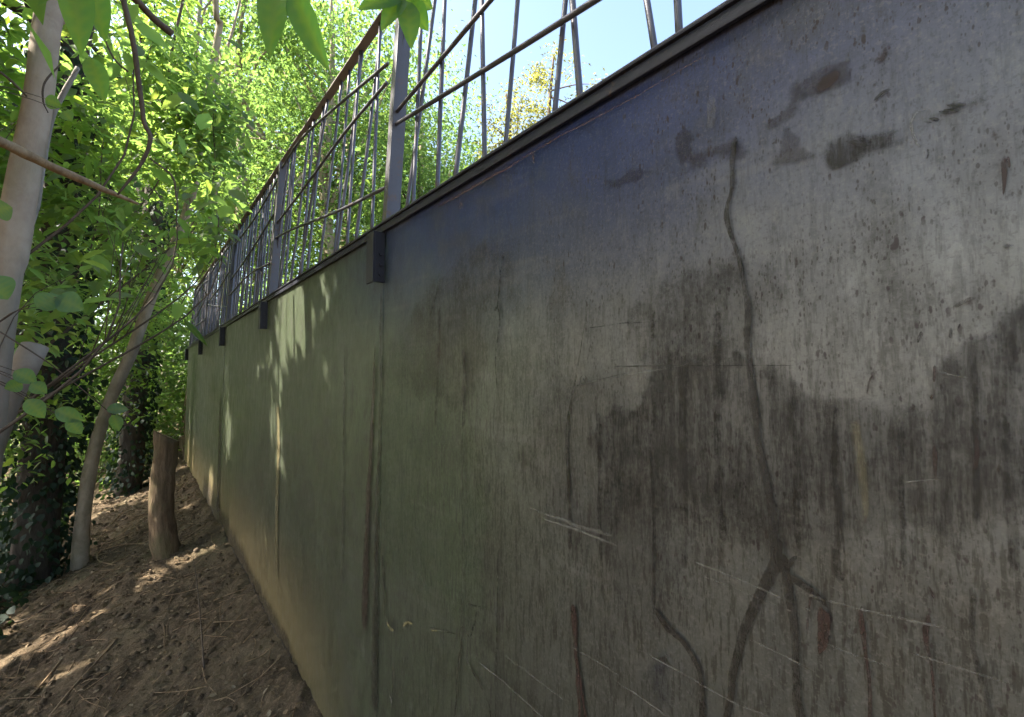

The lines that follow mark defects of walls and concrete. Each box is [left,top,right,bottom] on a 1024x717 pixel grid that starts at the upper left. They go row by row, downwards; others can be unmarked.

crack [565,326,740,530]
leakage [595,137,1024,717]